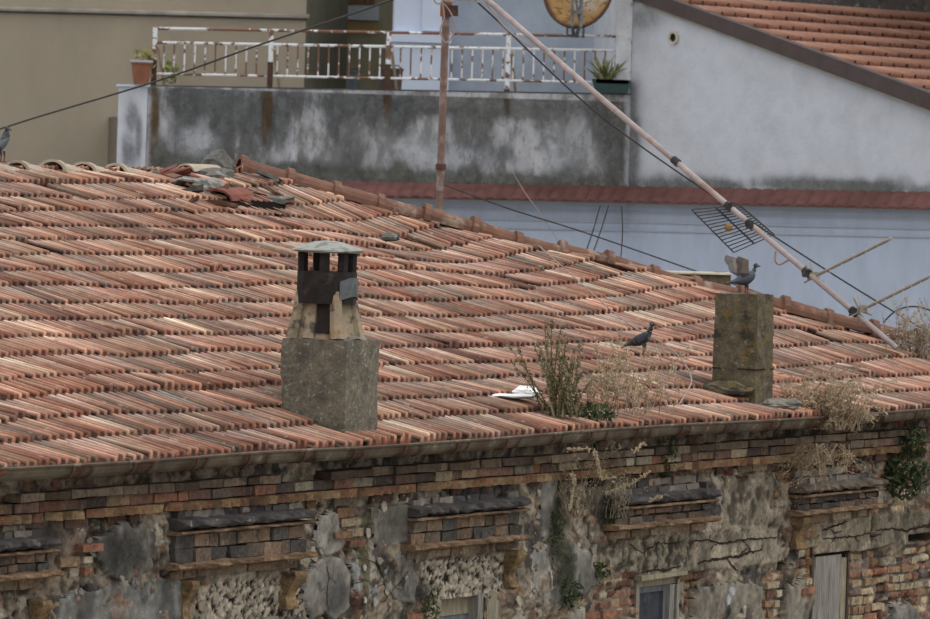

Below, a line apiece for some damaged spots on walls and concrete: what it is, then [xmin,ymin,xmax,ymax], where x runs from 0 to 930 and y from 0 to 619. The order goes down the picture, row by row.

leakage [123,105,141,164]
leakage [150,88,742,189]
leakage [754,178,930,192]
peeling [52,520,182,619]
peeling [299,497,436,619]
peeling [513,471,601,619]
spalling [563,586,633,619]
crack [629,537,794,573]
crack [823,521,930,543]
spalling [848,557,930,619]